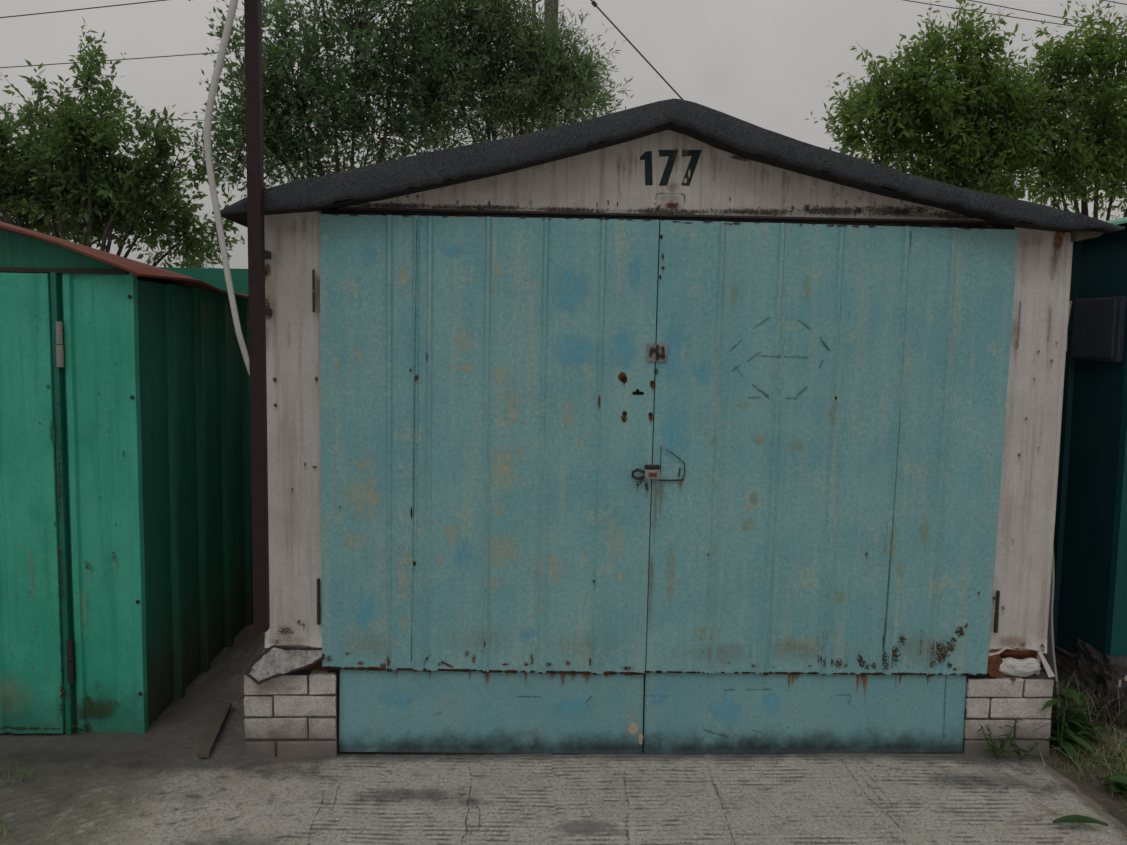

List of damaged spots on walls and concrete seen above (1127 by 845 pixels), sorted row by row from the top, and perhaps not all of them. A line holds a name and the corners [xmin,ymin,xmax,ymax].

rust [320,641,987,688]